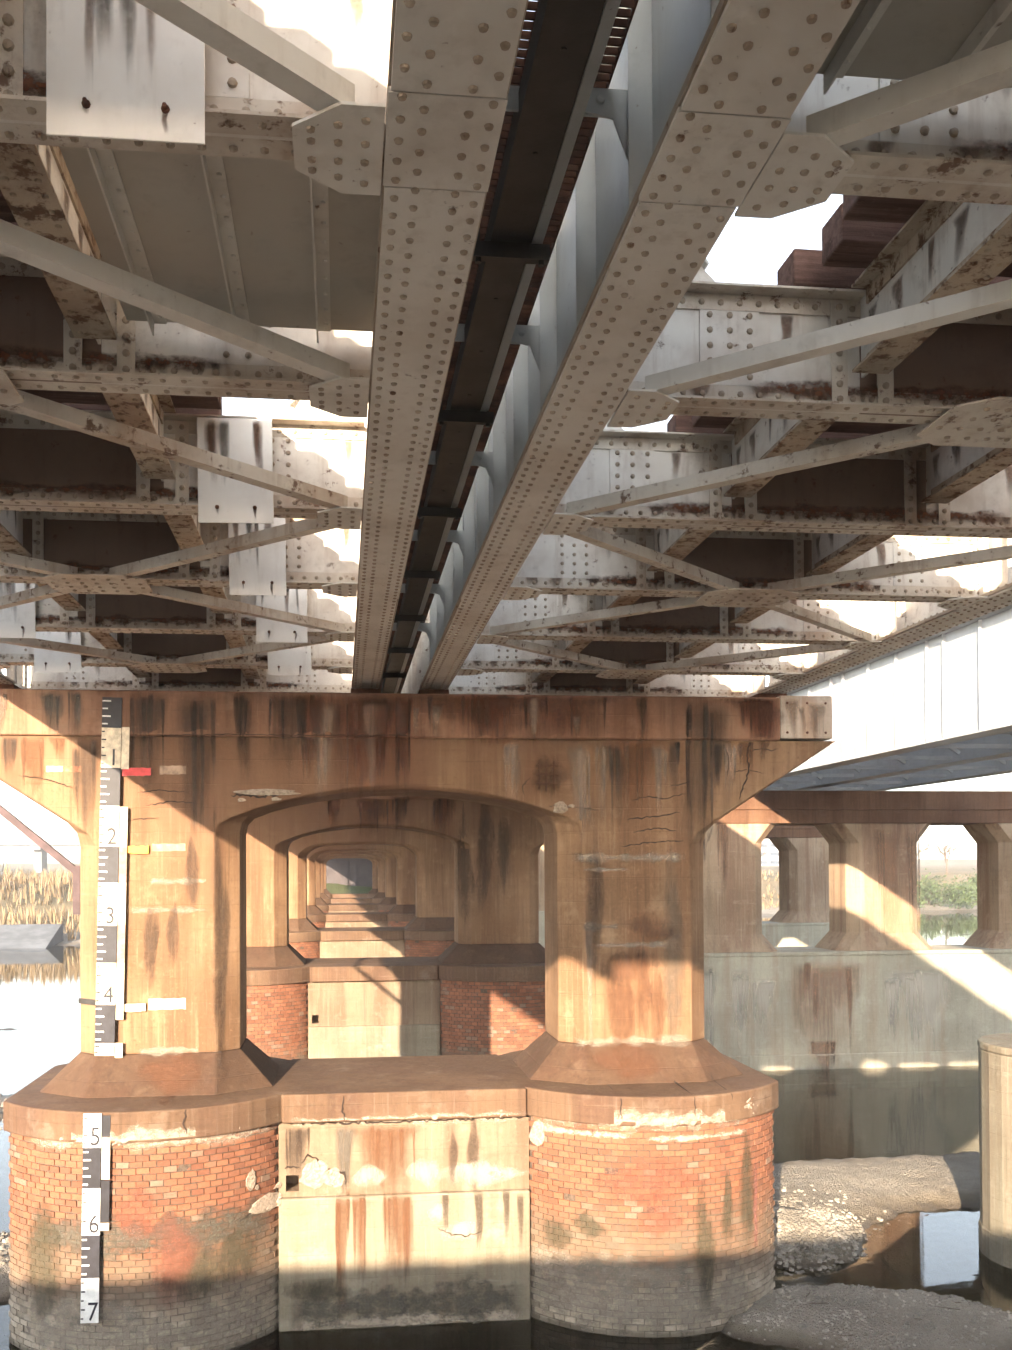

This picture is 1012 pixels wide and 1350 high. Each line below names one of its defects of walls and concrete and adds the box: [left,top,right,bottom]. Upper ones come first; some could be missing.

leakage [87,0,152,34]
rust [651,502,1010,550]
rust [23,614,256,635]
rust [69,655,411,769]
rust [428,685,682,733]
spalling [529,1120,545,1146]
leakage [544,1105,748,1142]
spalling [240,1154,346,1221]
leakage [100,1198,264,1259]
rust [353,1199,366,1258]
leakage [286,1110,530,1331]
leakage [29,1206,260,1350]